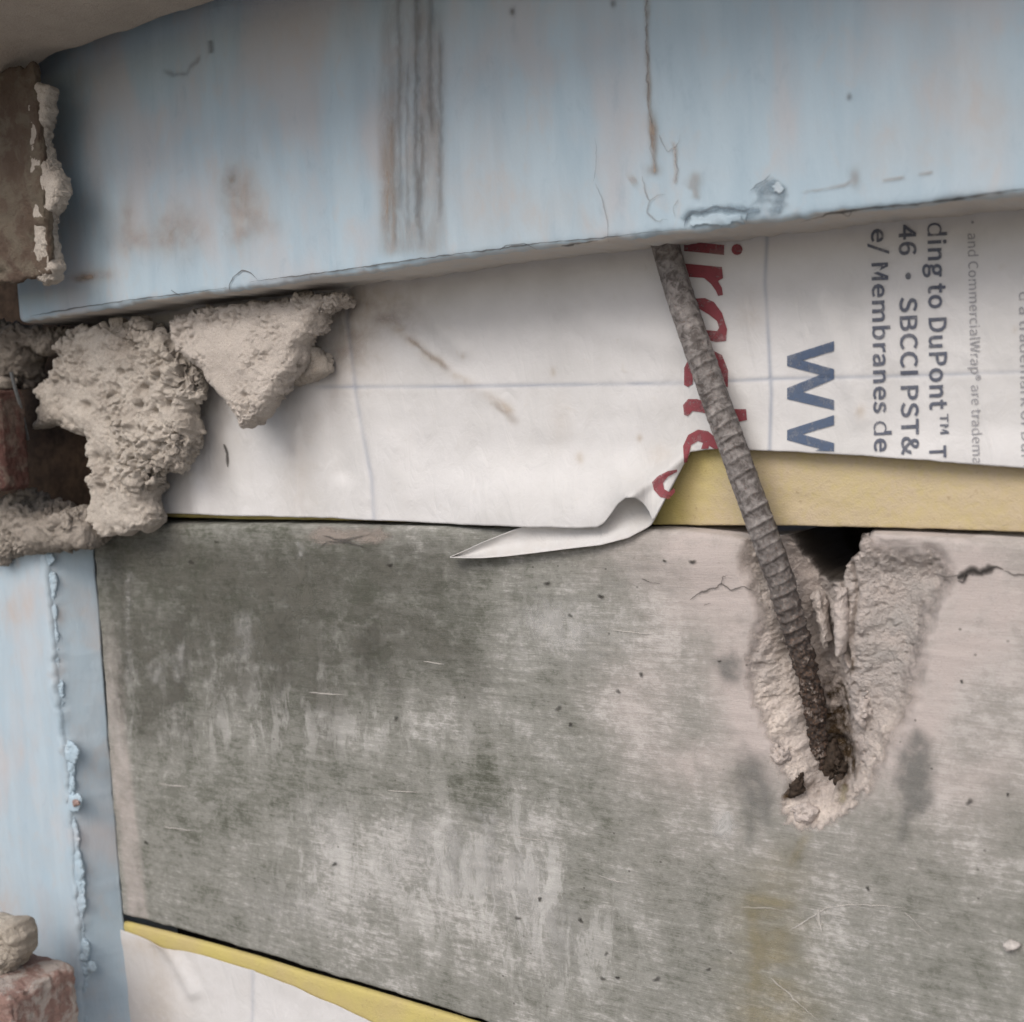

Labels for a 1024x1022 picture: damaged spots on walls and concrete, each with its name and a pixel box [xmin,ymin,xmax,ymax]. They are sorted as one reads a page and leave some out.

peeling [683,174,784,228]
crack [940,565,1024,583]
spalling [743,526,951,831]